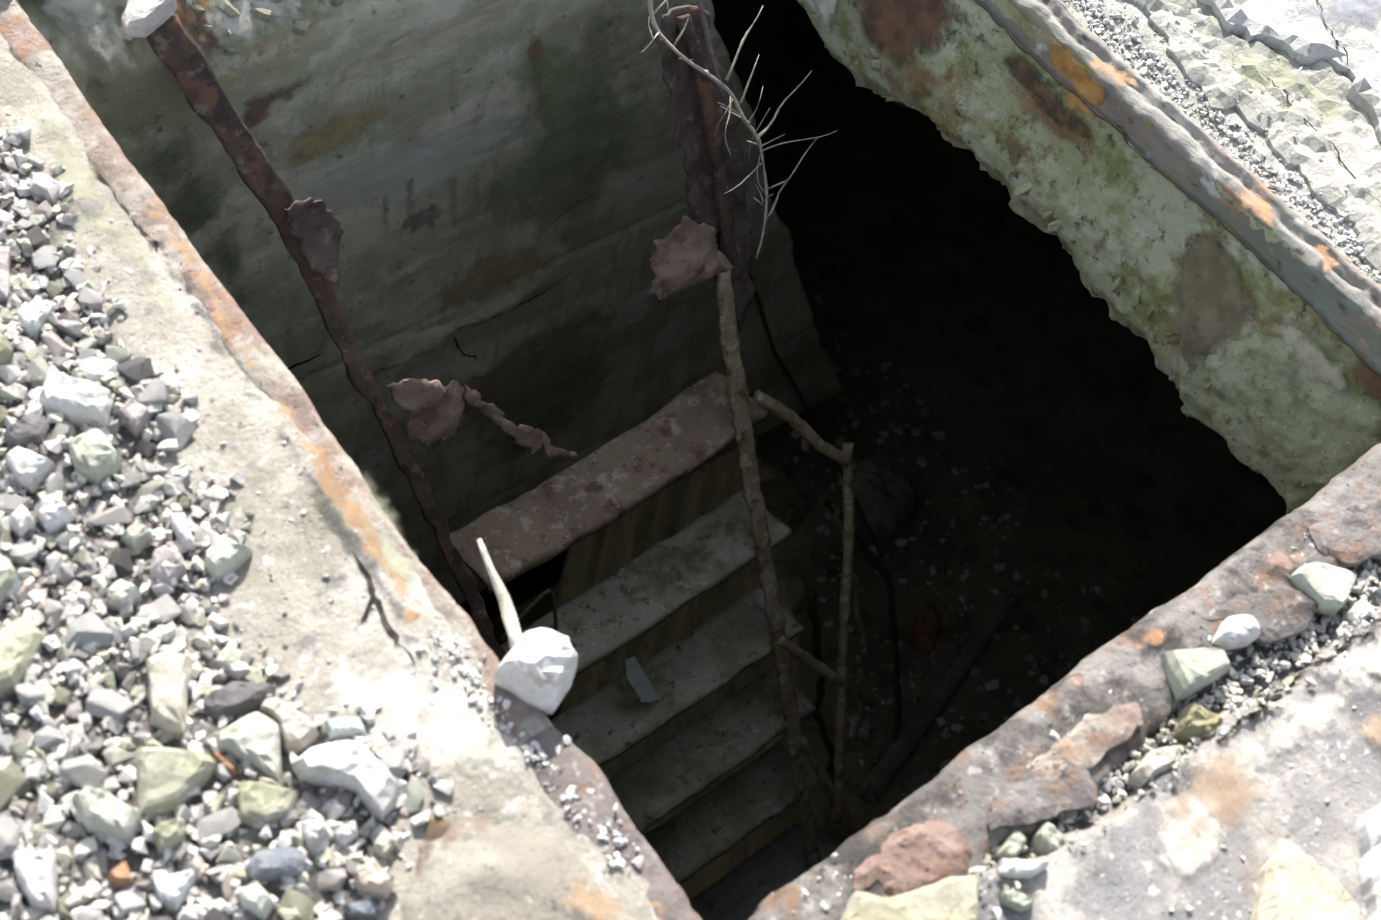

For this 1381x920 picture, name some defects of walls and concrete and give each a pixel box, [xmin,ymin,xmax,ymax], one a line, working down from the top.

crack [1316,0,1348,67]
corrosion [244,87,295,129]
corrosion [1004,45,1138,147]
crack [1264,75,1381,204]
corrosion [150,210,226,326]
corrosion [1242,194,1273,226]
corrosion [1314,245,1338,271]
corrosion [279,402,406,594]
crack [353,551,415,665]
corrosion [404,611,421,623]